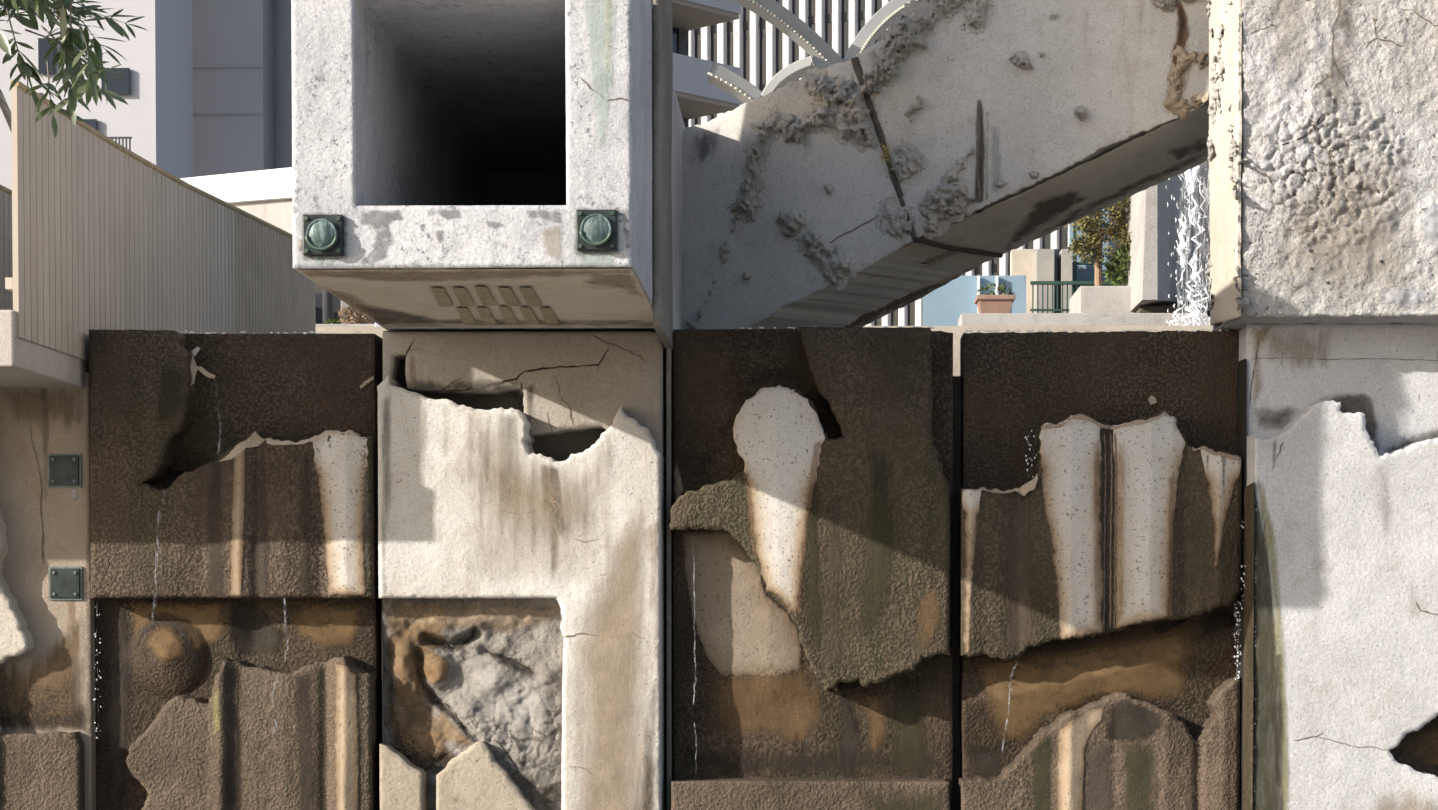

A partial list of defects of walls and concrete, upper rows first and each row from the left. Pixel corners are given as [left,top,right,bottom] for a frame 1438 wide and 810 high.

corrosion [1173,3,1188,65]
crack [974,102,982,202]
crack [1250,0,1438,265]
spalling [219,430,360,462]
spalling [360,331,665,476]
crack [406,333,646,428]
water stain [499,467,567,560]
spalling [1334,395,1376,439]
spalling [382,598,564,810]
water stain [387,604,560,771]
crack [420,628,596,772]
water stain [583,529,652,810]